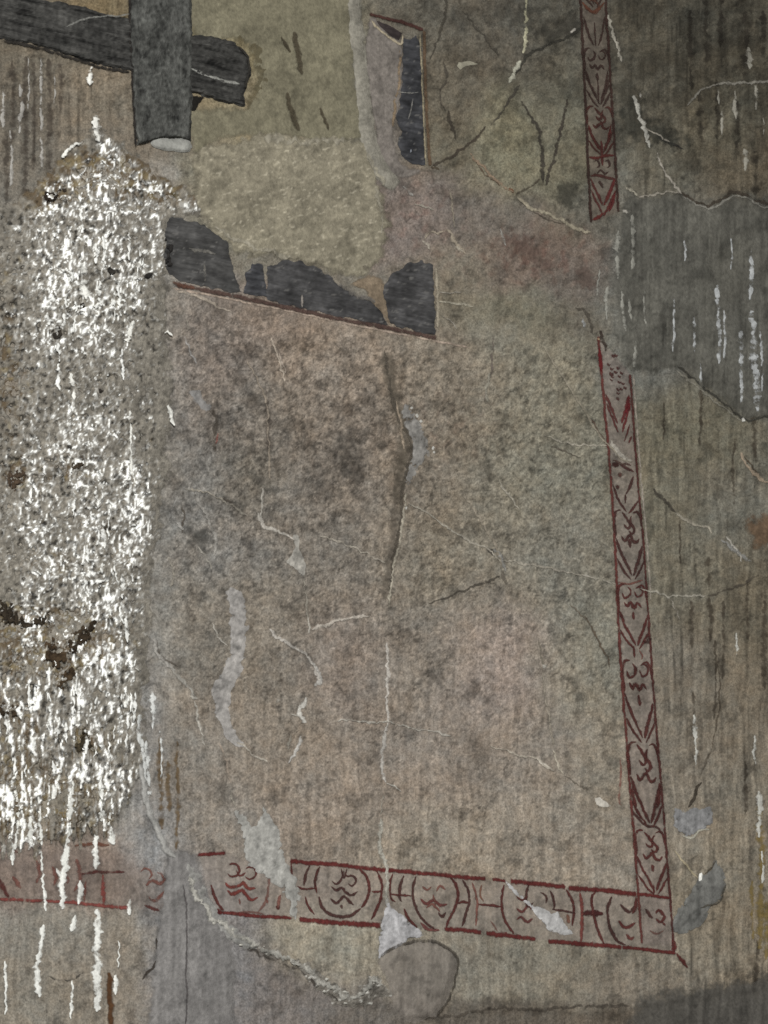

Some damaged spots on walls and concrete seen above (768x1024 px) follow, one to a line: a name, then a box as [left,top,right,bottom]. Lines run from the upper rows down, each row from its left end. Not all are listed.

crack [403,0,590,253]
crack [623,94,768,213]
damp [597,215,647,331]
damp [714,257,764,457]
damp [0,59,201,931]
crack [153,338,615,807]
crack [338,643,450,904]
damp [33,925,45,997]
damp [91,909,120,1012]
flaking render [234,807,301,919]
flaking render [186,864,392,1008]
flaking render [378,898,422,958]